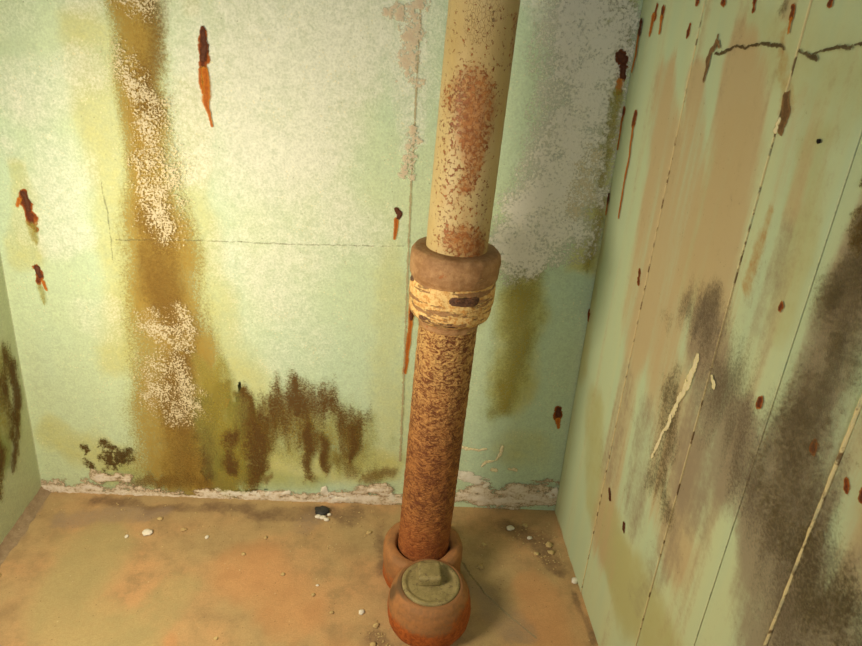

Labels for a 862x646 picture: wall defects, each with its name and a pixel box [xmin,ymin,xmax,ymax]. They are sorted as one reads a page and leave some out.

corrosion [198,26,213,127]
peeling [382,0,430,89]
corrosion [608,4,665,219]
crack [703,34,862,83]
corrosion [16,189,39,244]
corrosion [32,264,48,303]
leakage [80,0,370,496]
leakage [489,0,641,415]
leakage [0,343,22,500]
corrosion [553,406,563,429]
leakage [648,372,678,521]
leakage [710,206,862,646]